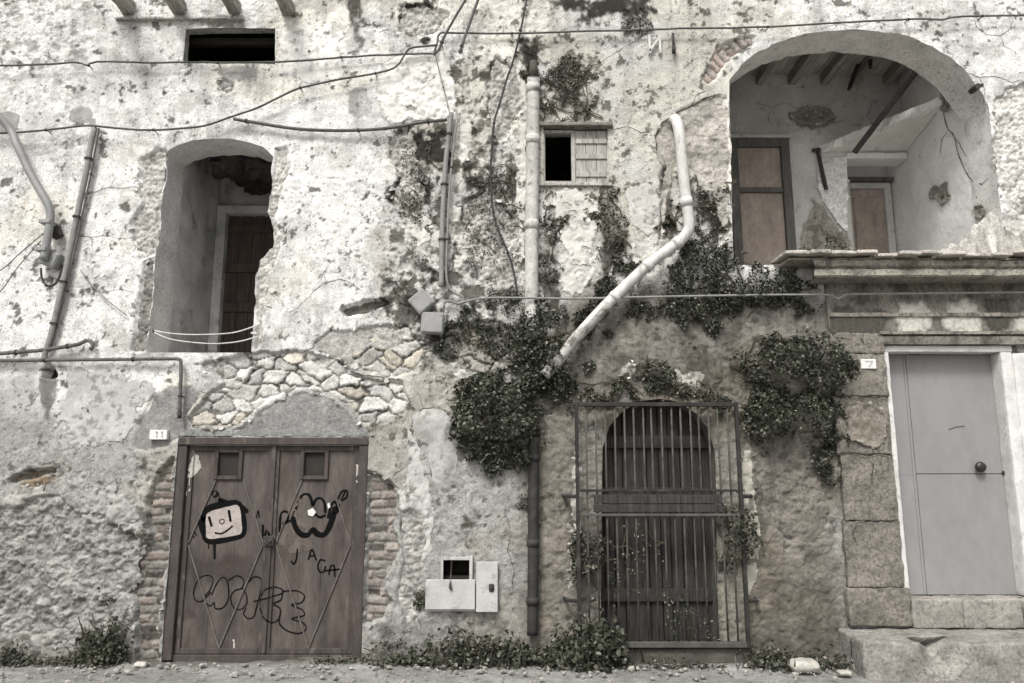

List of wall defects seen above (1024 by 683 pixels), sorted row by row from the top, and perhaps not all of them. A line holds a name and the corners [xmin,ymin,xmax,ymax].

spalling [929,181,951,206]
crack [940,112,986,199]
peeling [52,364,374,452]
peeling [1,462,60,516]
peeling [79,481,140,528]
peeling [395,431,435,569]